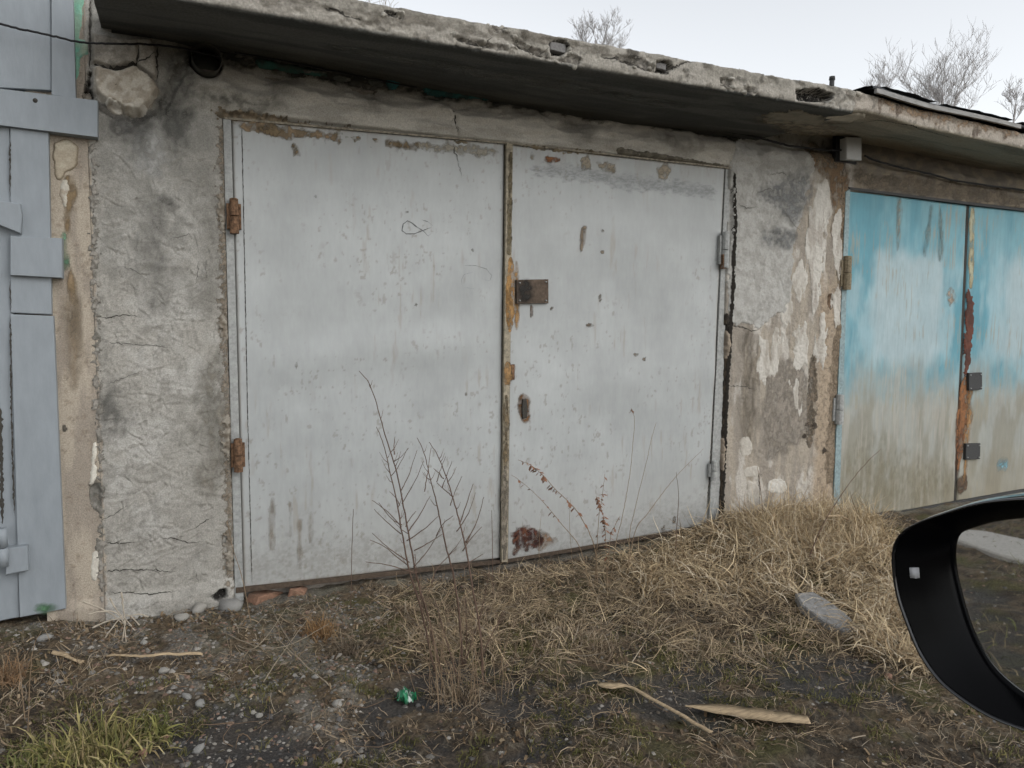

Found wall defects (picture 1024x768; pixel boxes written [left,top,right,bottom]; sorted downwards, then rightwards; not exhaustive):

flaking render [52,139,79,207]
peeling [74,0,161,135]
crack [103,314,175,349]
spalling [210,106,351,589]
peeling [415,136,498,157]
rust [505,152,533,332]
rust [501,362,553,560]
crack [718,172,786,516]
peeling [756,178,845,484]
flaking render [761,88,865,125]
rust [948,289,975,494]
crack [108,569,197,595]